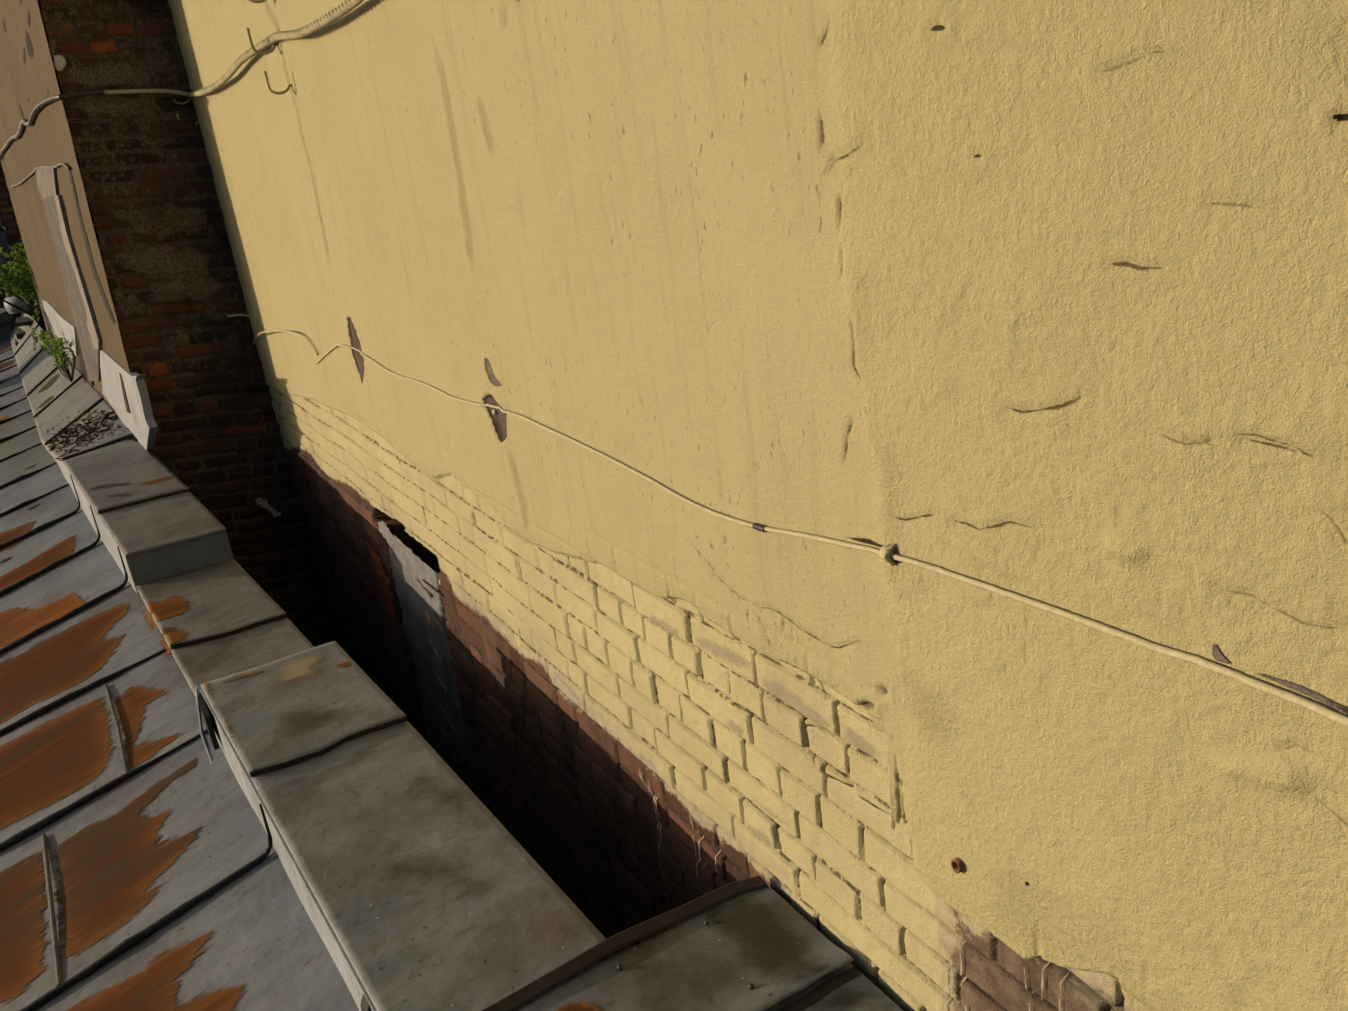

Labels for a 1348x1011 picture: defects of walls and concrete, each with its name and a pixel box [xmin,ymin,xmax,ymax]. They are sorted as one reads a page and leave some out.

crack [820,120,859,170]
crack [1111,262,1161,270]
crack [851,323,860,380]
crack [1009,397,1079,413]
crack [1162,433,1311,457]
rust [0,520,36,552]
rust [0,534,76,590]
crack [895,514,1029,530]
rust [0,592,191,723]
rust [0,685,182,829]
rust [0,757,201,1004]
rust [65,930,246,1011]